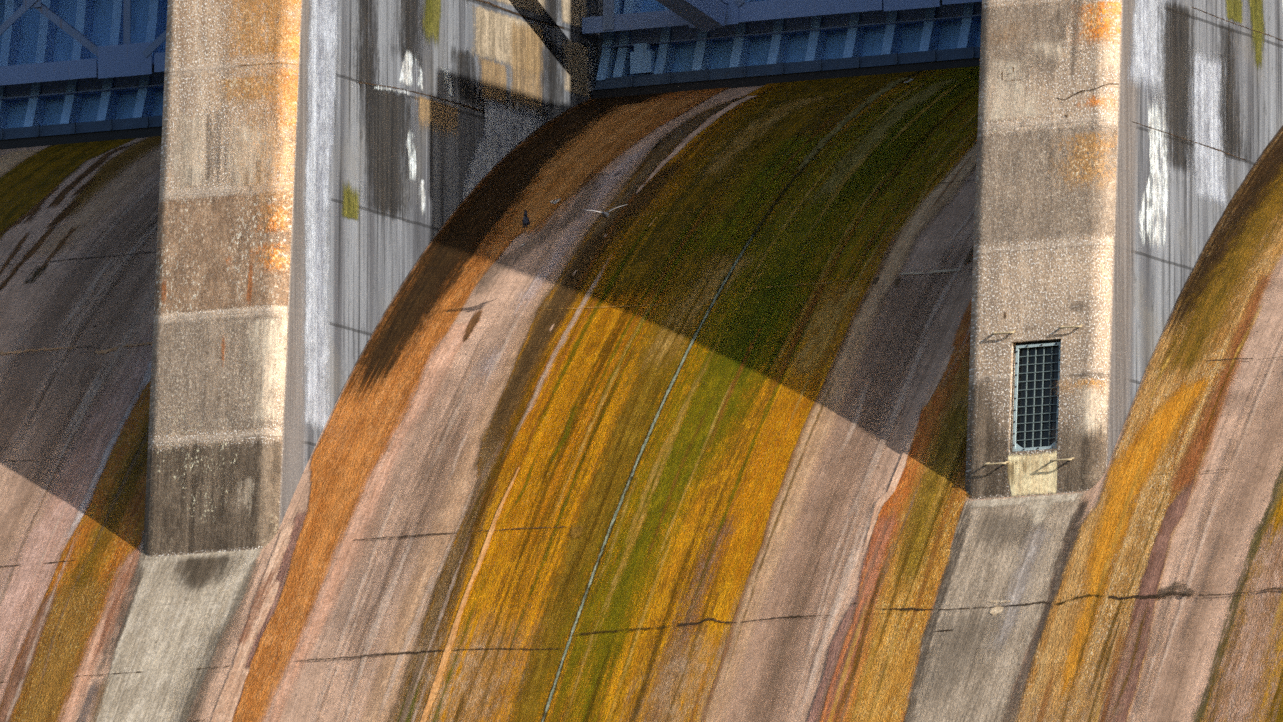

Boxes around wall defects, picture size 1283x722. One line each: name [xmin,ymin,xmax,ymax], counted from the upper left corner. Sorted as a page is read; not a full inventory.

water stain [704,96,826,177]
water stain [813,79,955,202]
water stain [983,60,1042,129]
water stain [706,142,977,722]
water stain [59,512,306,722]
crack [298,580,1283,661]